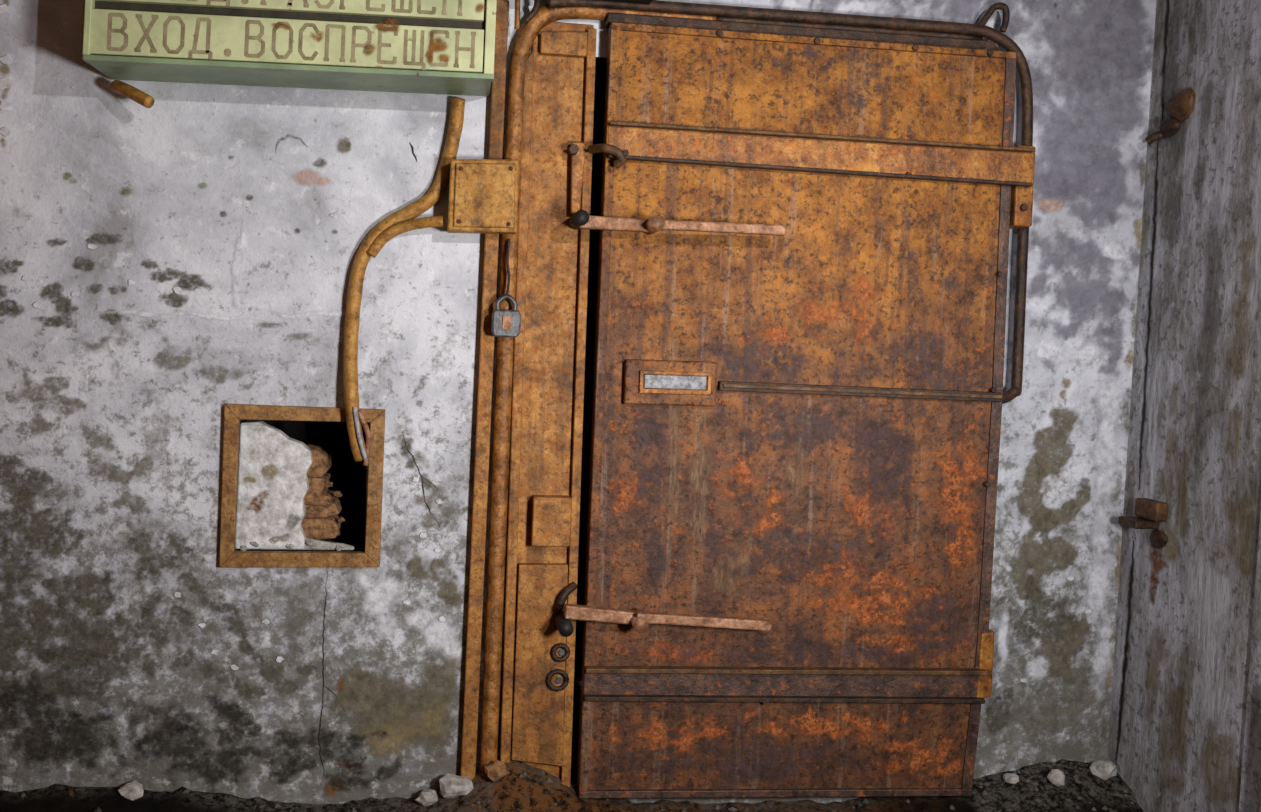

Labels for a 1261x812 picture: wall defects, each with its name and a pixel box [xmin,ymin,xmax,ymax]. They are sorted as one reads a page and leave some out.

damp [1171,59,1240,199]
damp [6,375,86,433]
damp [89,436,153,513]
corrosion [755,490,782,537]
corrosion [937,445,986,568]
damp [891,0,1179,741]
damp [1147,360,1188,534]
damp [0,456,462,790]
corrosion [788,549,943,654]
corrosion [1150,533,1178,602]
corrosion [610,718,728,752]
corrosion [744,705,960,776]